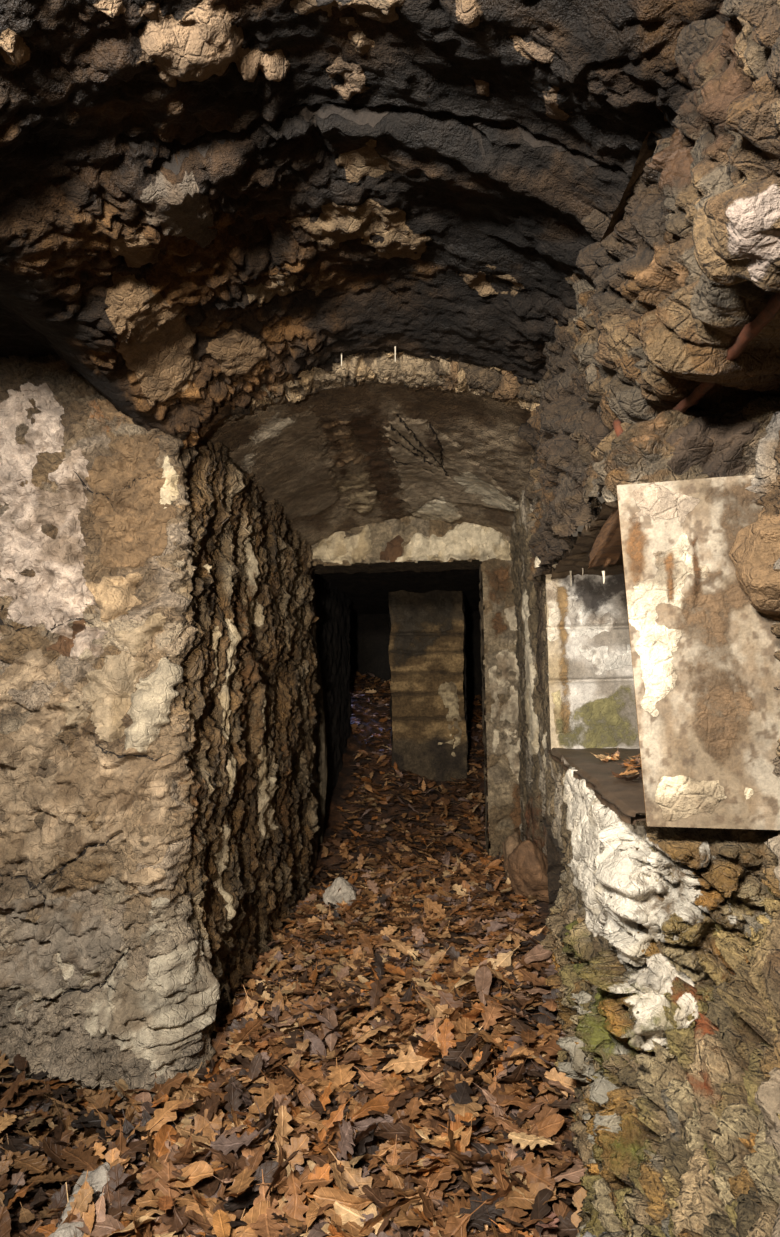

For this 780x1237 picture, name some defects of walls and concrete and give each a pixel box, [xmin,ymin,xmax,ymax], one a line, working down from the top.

water stain [322,406,458,520]
water stain [454,472,532,512]
peeling [0,381,221,1076]
crack [95,744,171,761]
crack [0,832,122,910]
crack [35,948,130,1001]
water stain [556,766,766,1170]